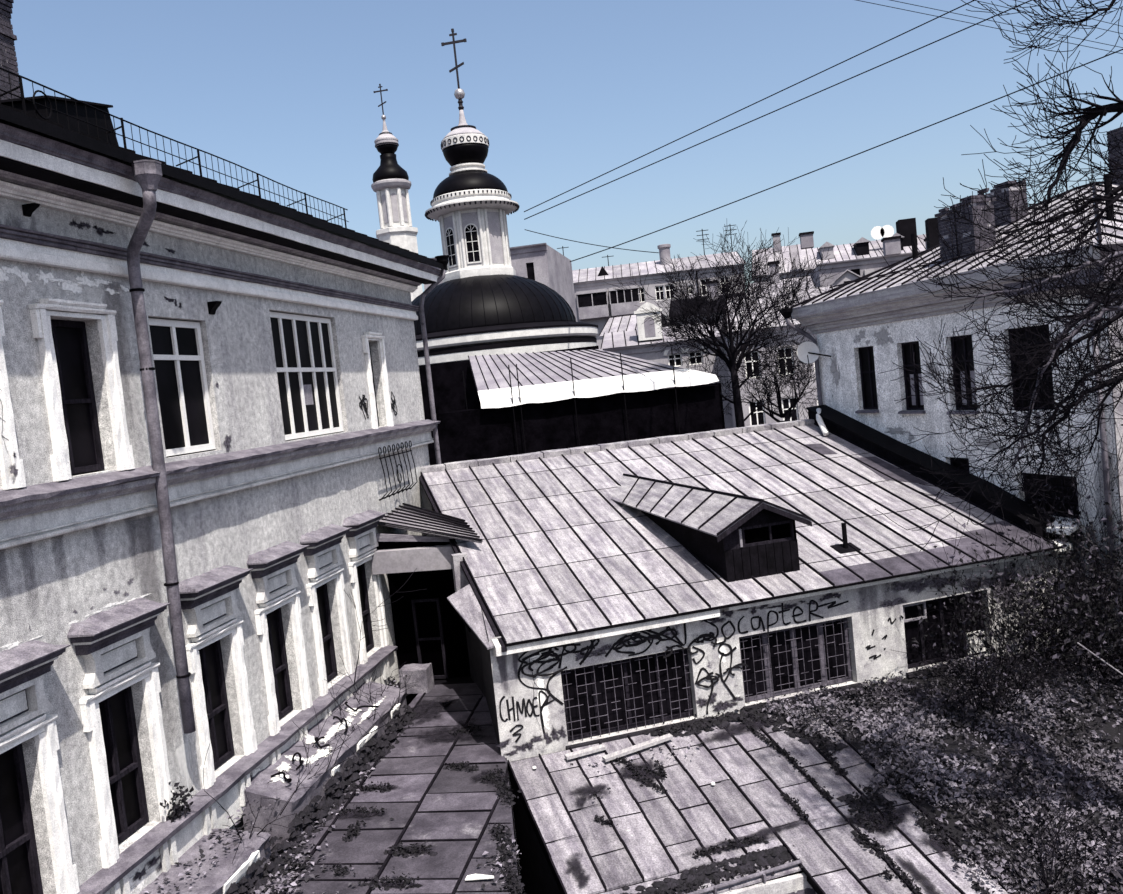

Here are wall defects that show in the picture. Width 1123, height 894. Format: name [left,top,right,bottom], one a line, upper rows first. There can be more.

peeling [0,265,129,295]